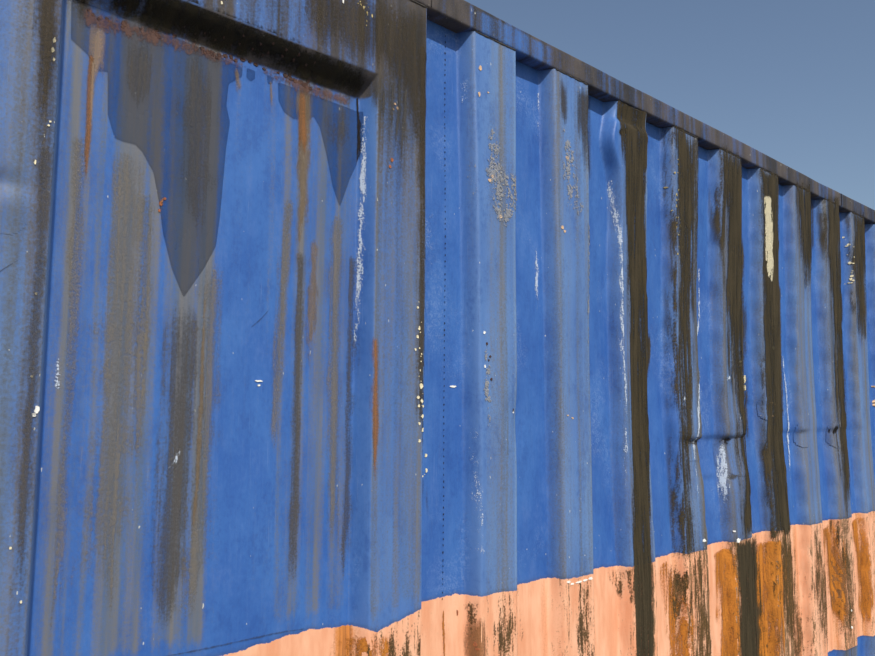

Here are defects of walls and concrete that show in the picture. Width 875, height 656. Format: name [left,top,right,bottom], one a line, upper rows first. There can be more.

rust [85,9,347,240]
damp [111,0,364,160]
damp [617,100,654,656]
damp [665,125,699,555]
damp [712,148,770,656]
peeling [764,196,774,281]
damp [760,168,790,538]
damp [796,181,867,515]
rust [660,562,695,656]
rust [714,549,742,656]
rust [757,537,812,656]
rust [823,518,874,623]